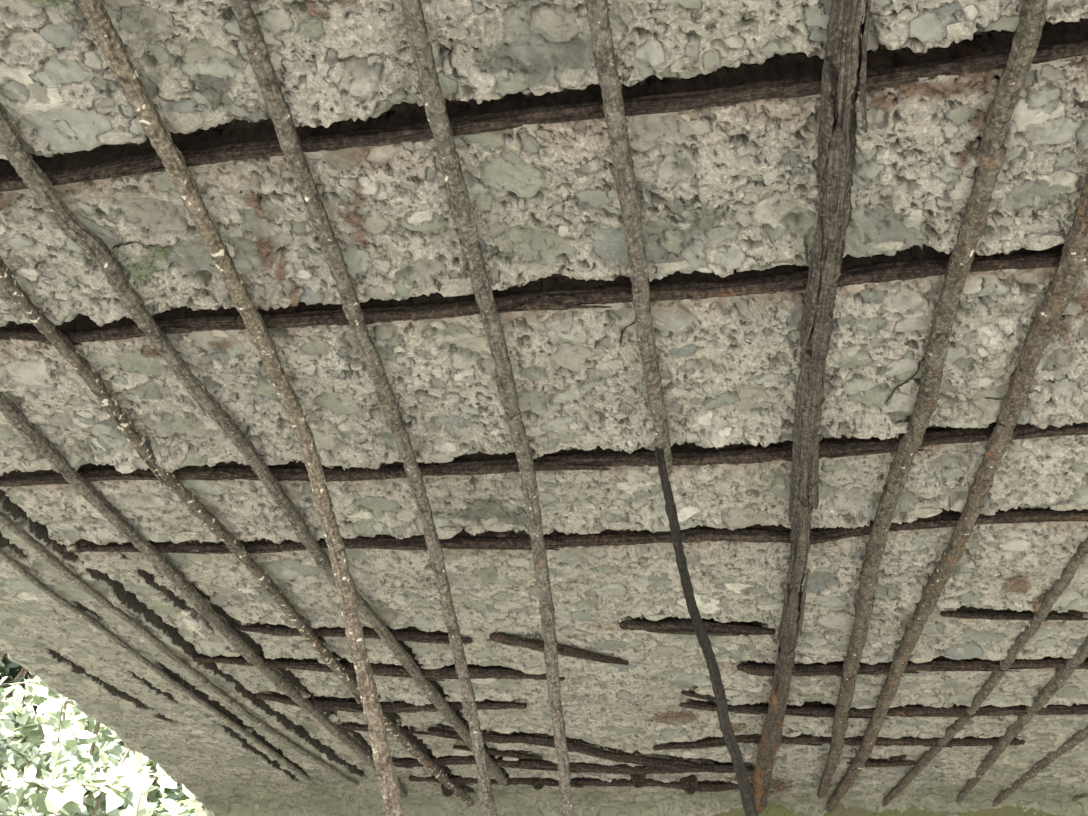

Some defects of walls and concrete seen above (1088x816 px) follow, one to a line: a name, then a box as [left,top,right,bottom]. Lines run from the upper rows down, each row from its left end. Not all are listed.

rust [870,70,994,113]
rust [957,142,974,166]
rust [340,186,367,248]
rust [257,239,300,306]
spalling [974,500,1088,526]
rust [1005,574,1048,613]
spalling [0,512,369,787]
spalling [903,537,1088,716]
rust [650,711,696,724]
spalling [956,637,1088,807]
spalling [383,712,478,807]
spalling [565,737,735,773]